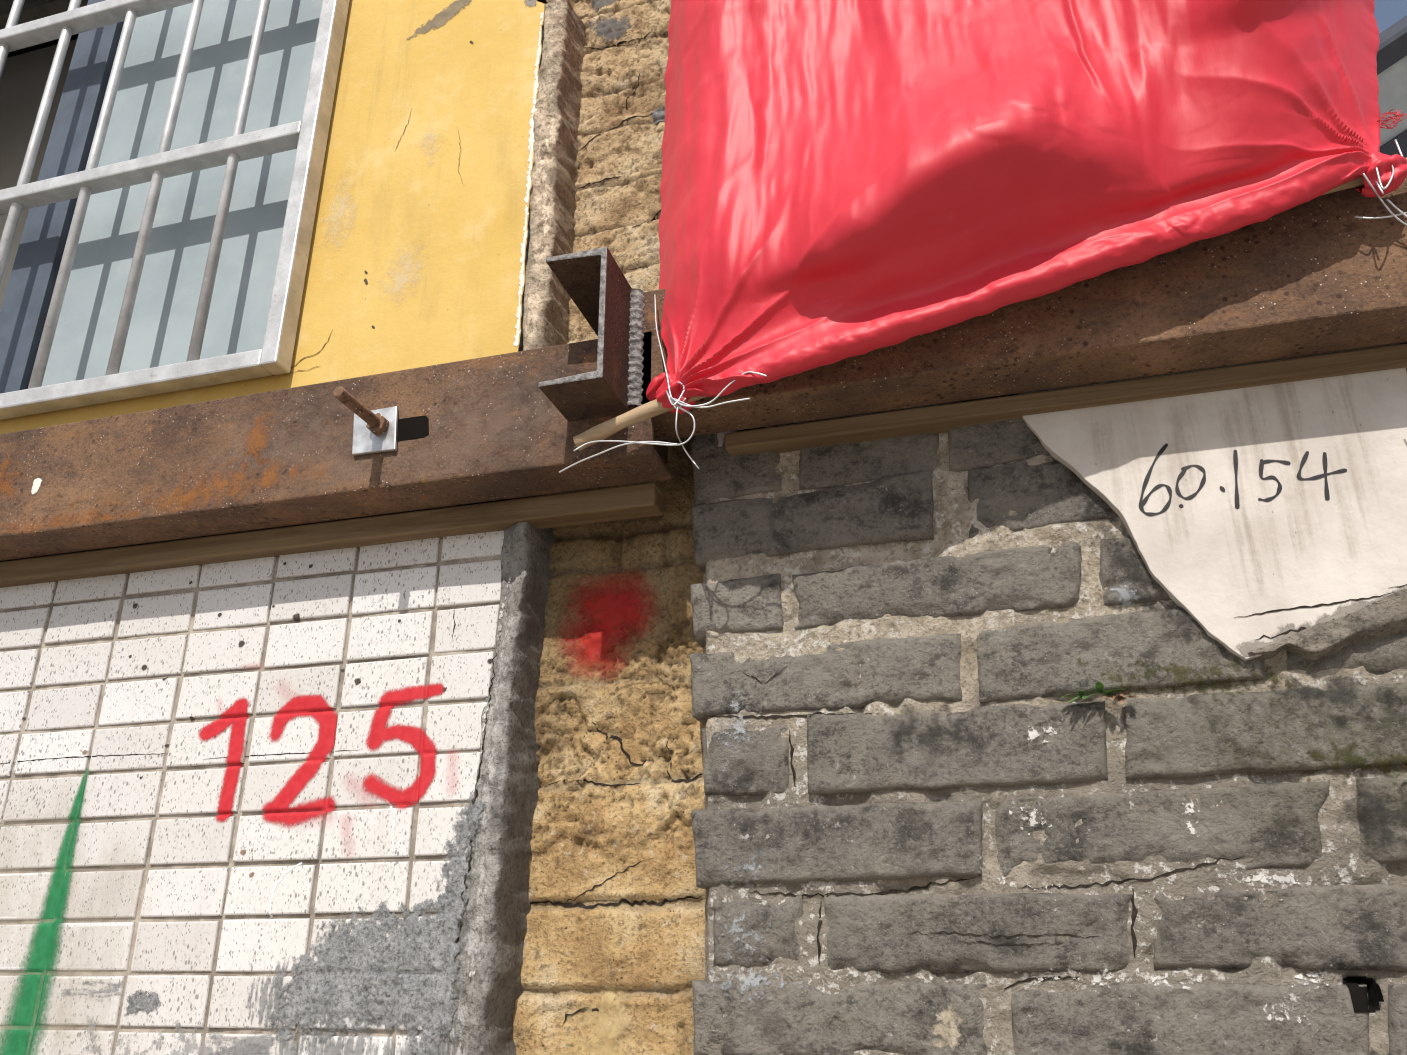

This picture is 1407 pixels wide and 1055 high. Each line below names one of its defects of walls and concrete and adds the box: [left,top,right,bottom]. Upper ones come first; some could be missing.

crack [548,722,703,787]
crack [530,858,701,909]
crack [747,877,975,964]
crack [907,857,1242,990]
peeling [1342,976,1384,1013]